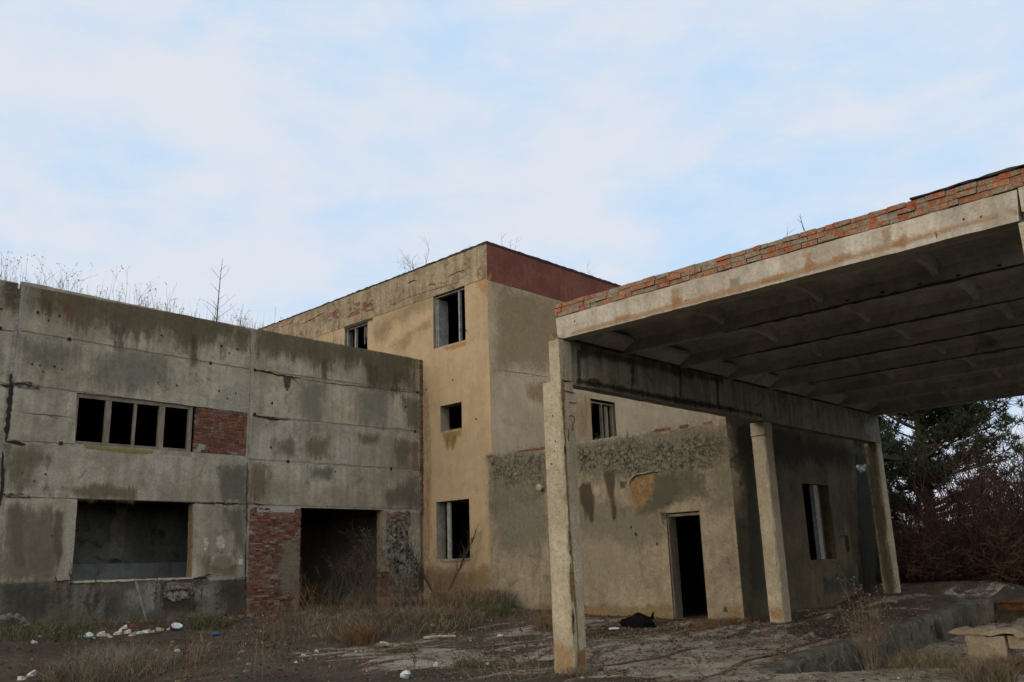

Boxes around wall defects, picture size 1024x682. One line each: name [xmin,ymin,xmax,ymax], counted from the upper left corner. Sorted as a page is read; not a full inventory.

crack [0,373,71,505]
damp [2,281,419,443]
crack [256,370,419,394]
flaking render [376,511,419,597]
flaking render [491,358,724,665]
damp [576,345,764,589]